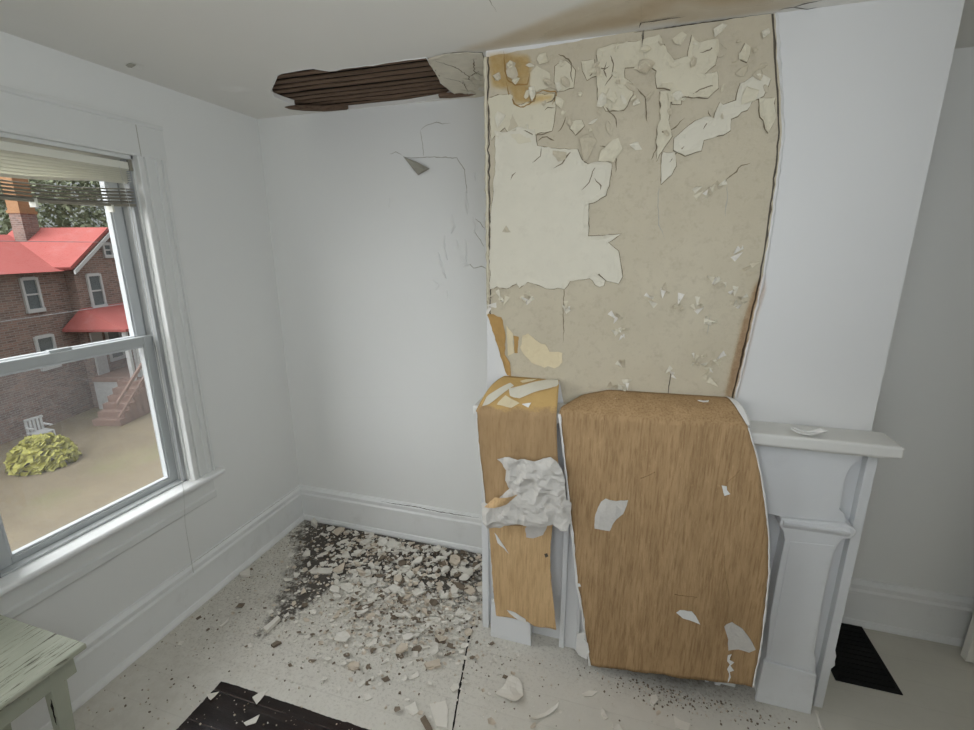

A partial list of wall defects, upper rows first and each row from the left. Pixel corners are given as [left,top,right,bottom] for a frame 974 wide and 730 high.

spalling [270,57,451,113]
flaking render [486,13,782,404]